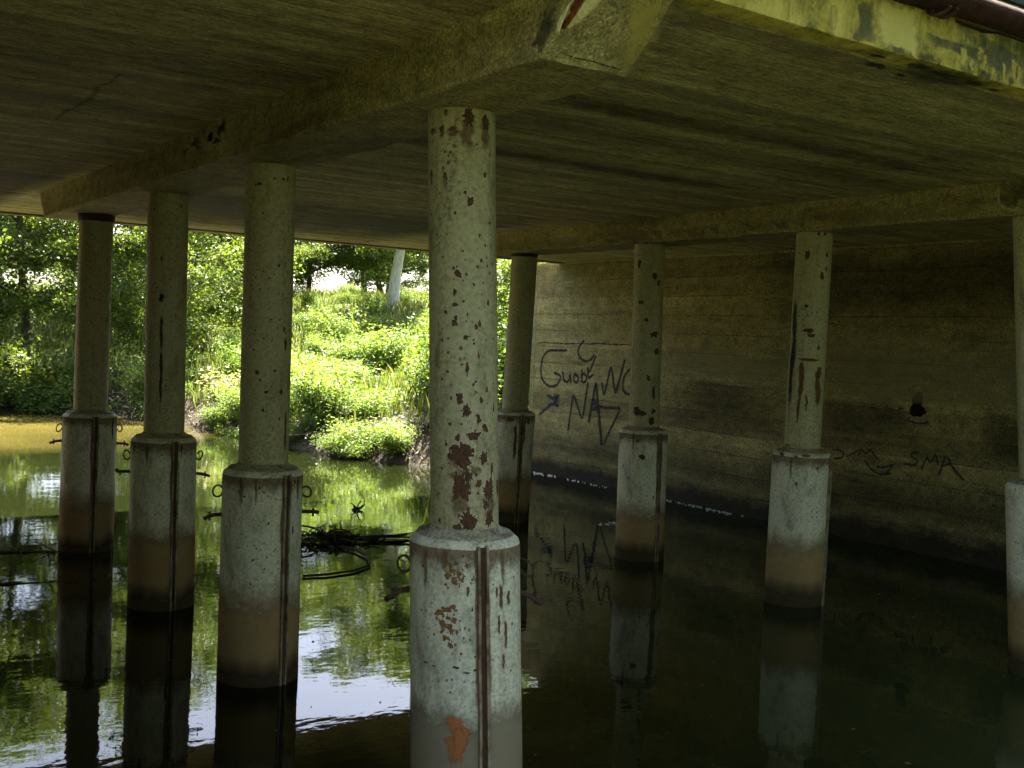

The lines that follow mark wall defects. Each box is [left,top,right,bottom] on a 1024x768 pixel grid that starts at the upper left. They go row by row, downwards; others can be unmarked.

spalling [556,0,601,46]
water stain [853,2,874,41]
water stain [930,10,1021,82]
corrosion [431,121,489,145]
corrosion [796,358,822,421]
water stain [58,497,115,553]
water stain [127,513,195,612]
water stain [216,592,300,688]
corrosion [409,540,521,668]
water stain [498,419,618,523]
water stain [615,445,770,562]
water stain [763,515,1007,608]